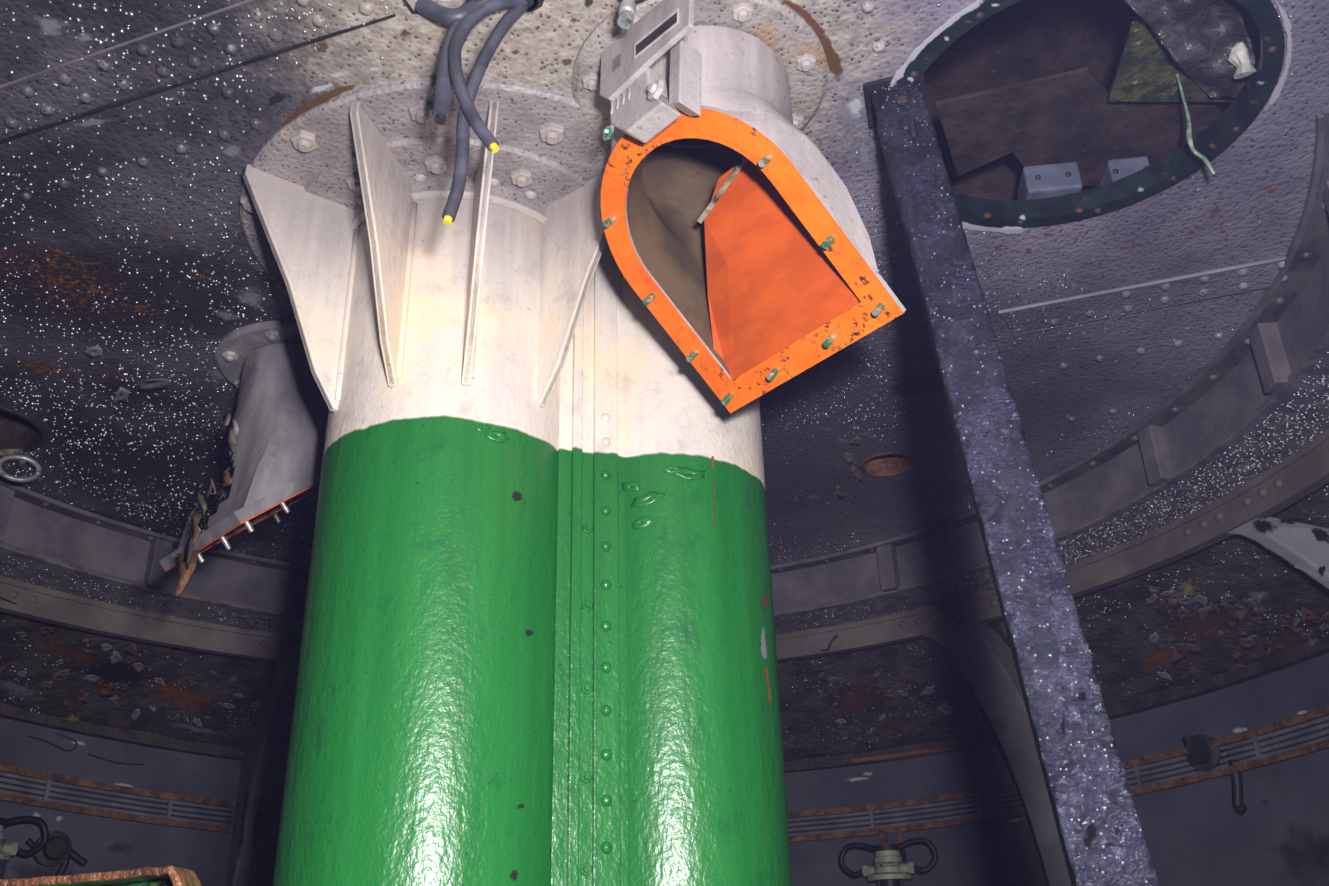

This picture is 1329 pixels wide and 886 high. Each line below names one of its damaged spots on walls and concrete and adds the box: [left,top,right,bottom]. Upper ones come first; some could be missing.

corrosion [783,0,843,80]
corrosion [0,241,178,333]
peeling [1253,519,1294,555]
peeling [1312,528,1329,543]
peeling [1292,564,1329,581]